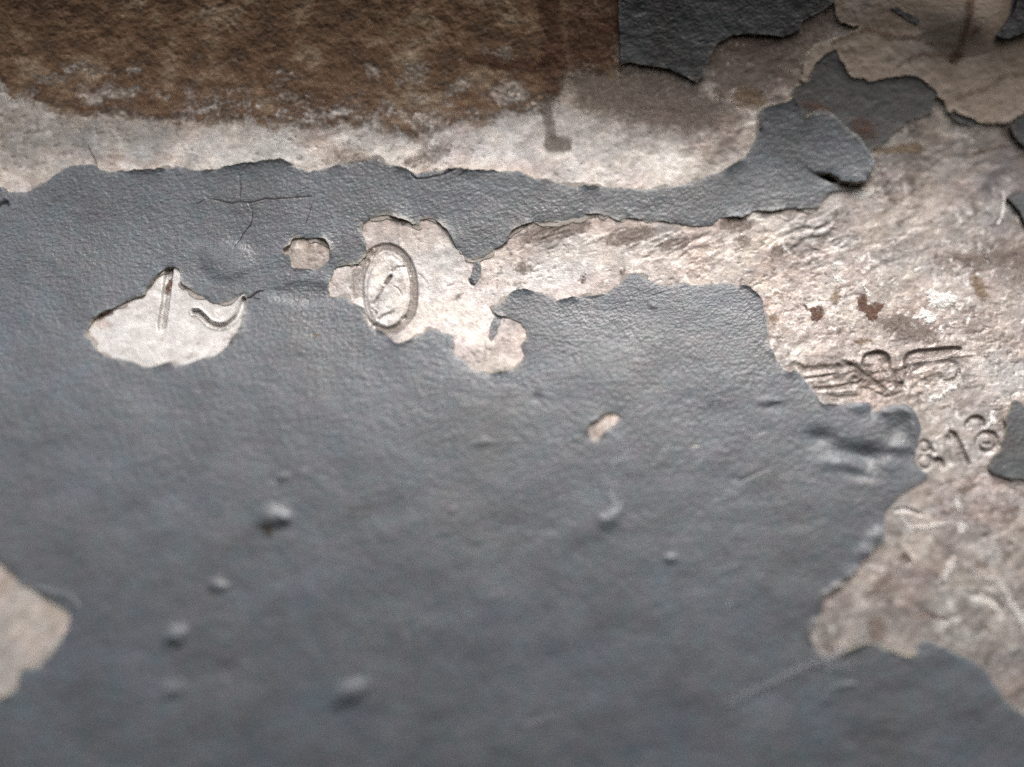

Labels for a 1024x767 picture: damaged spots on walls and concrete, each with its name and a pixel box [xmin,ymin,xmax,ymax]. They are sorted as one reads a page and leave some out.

peeling [0,1,858,192]
peeling [89,268,247,366]
crack [195,182,315,247]
peeling [284,239,330,269]
peeling [328,97,1024,713]
peeling [0,563,71,695]